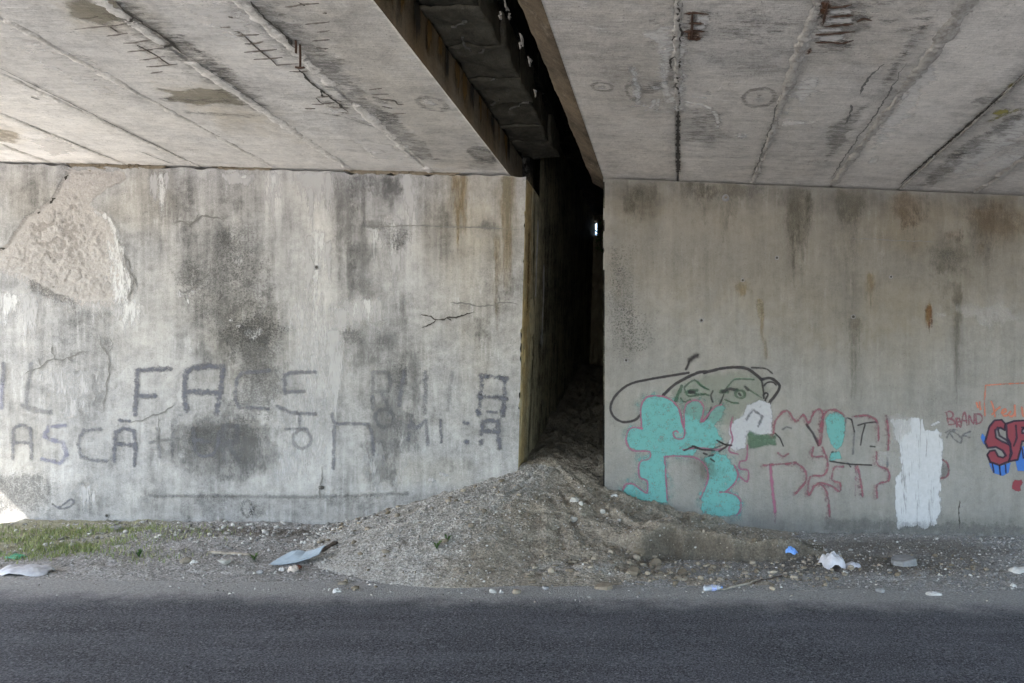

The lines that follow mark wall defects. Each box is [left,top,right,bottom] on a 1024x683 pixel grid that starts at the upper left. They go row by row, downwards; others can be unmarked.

crack [669,3,684,174]
crack [753,93,782,174]
crack [832,64,906,177]
crack [901,76,1024,184]
spalling [0,163,166,314]
crack [421,295,518,327]
crack [25,335,113,410]